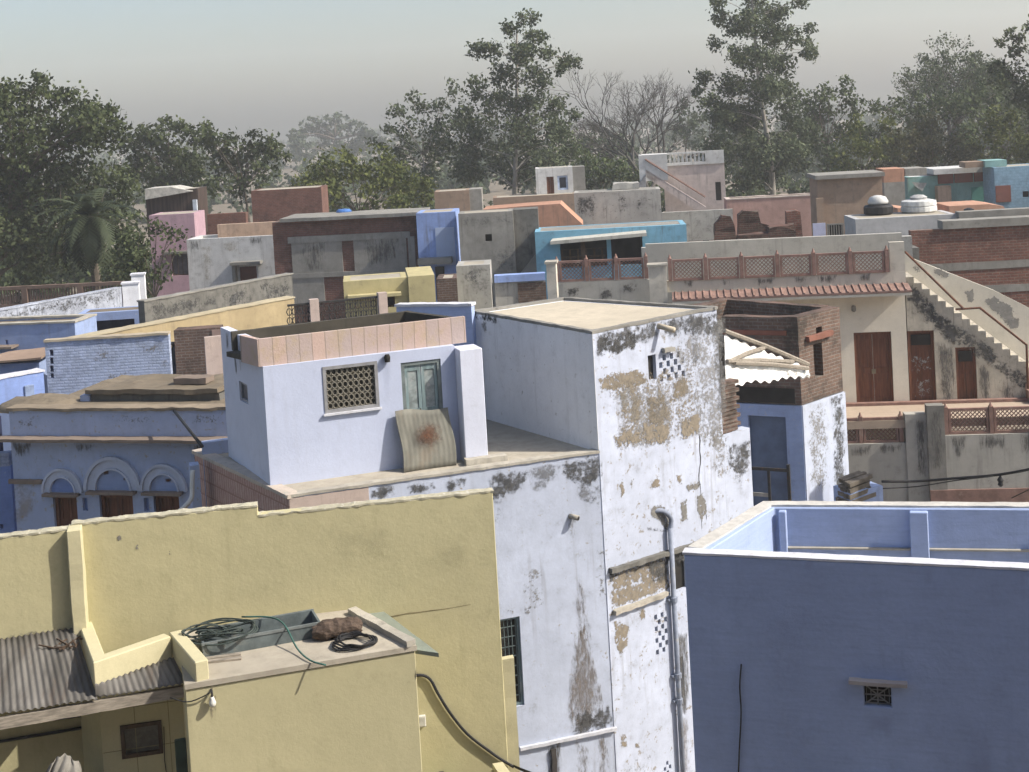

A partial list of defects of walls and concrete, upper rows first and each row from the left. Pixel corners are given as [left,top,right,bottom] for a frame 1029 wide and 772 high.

damp [907,285,1026,399]
peeling [599,327,728,476]
damp [372,486,392,499]
damp [491,456,602,501]
peeling [599,552,685,620]
peeling [614,621,629,653]
damp [569,586,612,770]